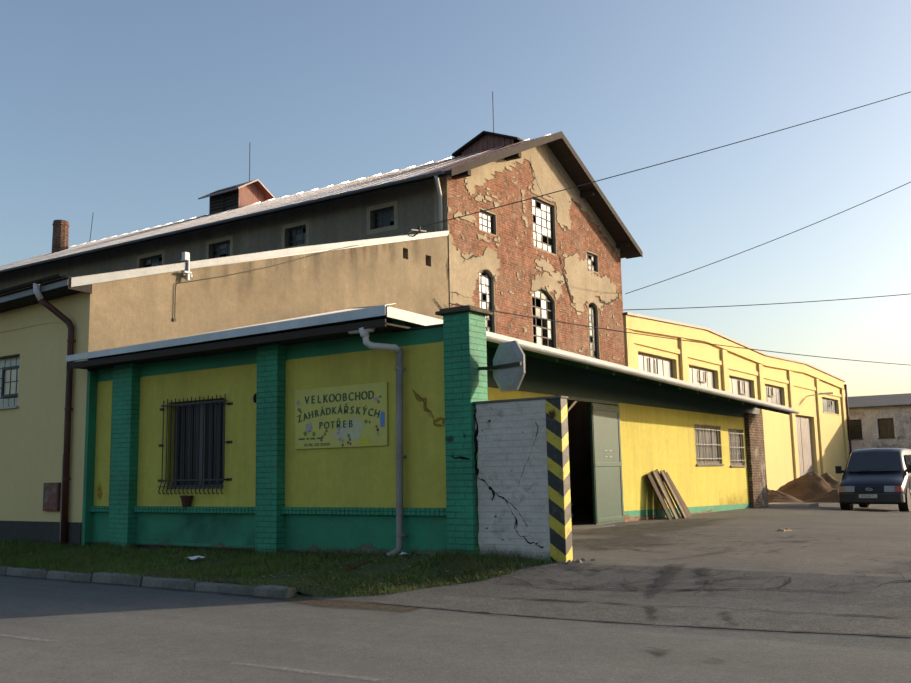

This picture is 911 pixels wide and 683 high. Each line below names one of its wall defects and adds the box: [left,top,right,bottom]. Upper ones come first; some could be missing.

flaking render [447,159,626,366]
crack [412,389,445,427]
crack [450,421,759,592]